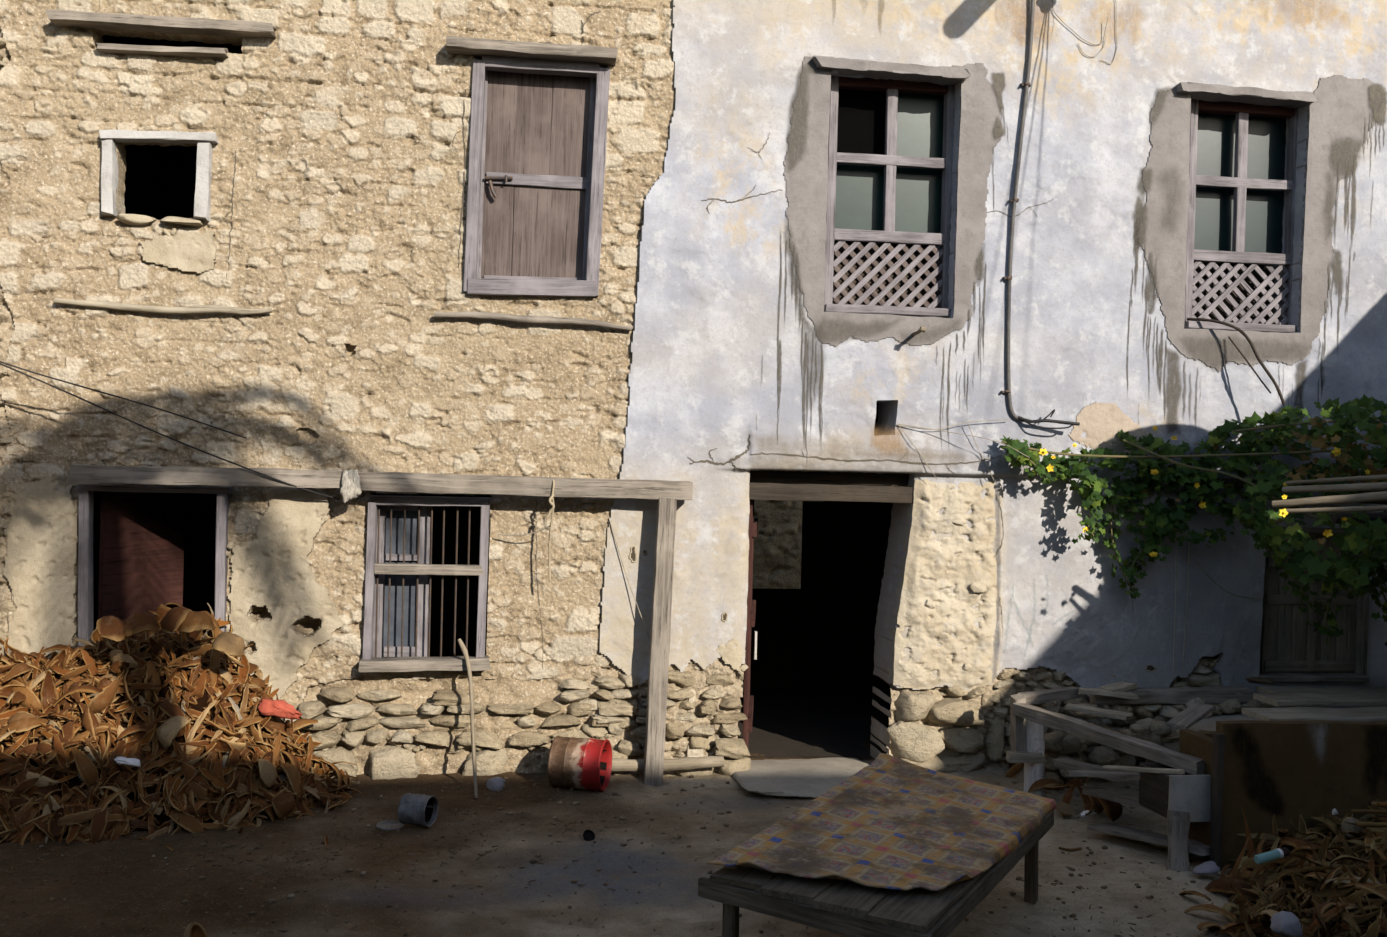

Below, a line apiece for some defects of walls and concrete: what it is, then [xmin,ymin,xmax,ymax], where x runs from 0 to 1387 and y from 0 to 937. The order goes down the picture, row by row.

crack [701,132,783,214]
damp [777,234,887,453]
damp [1153,88,1170,121]
damp [1127,169,1198,433]
damp [1279,84,1387,418]
peeling [226,489,345,700]
spalling [577,656,648,774]
spalling [663,639,751,777]